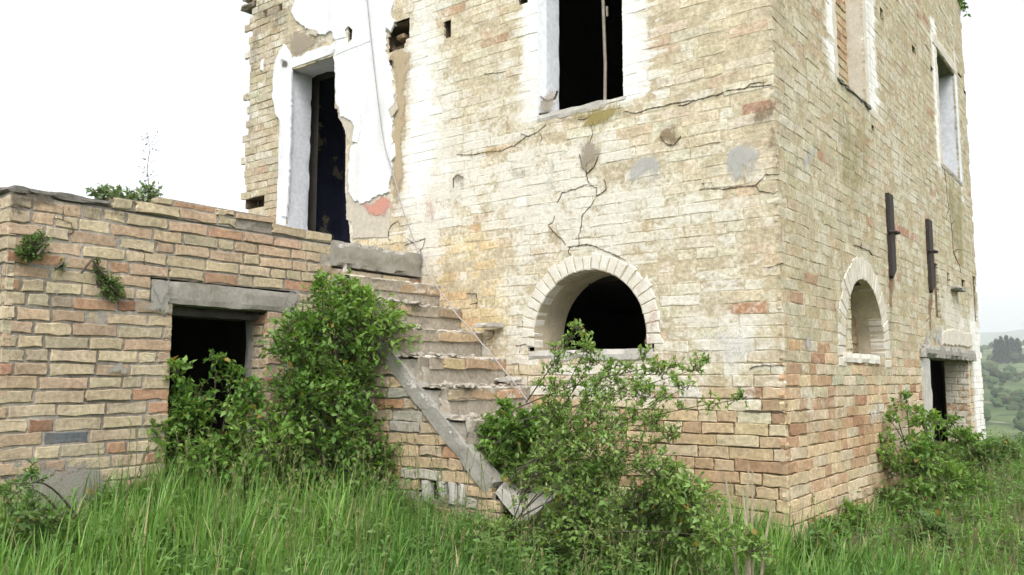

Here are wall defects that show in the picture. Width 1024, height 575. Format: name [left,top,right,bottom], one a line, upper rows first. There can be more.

crack [626,82,772,114]
peeling [260,0,412,240]
crack [461,124,546,155]
hole [245,196,264,209]
crack [548,117,625,260]
crack [699,174,780,194]